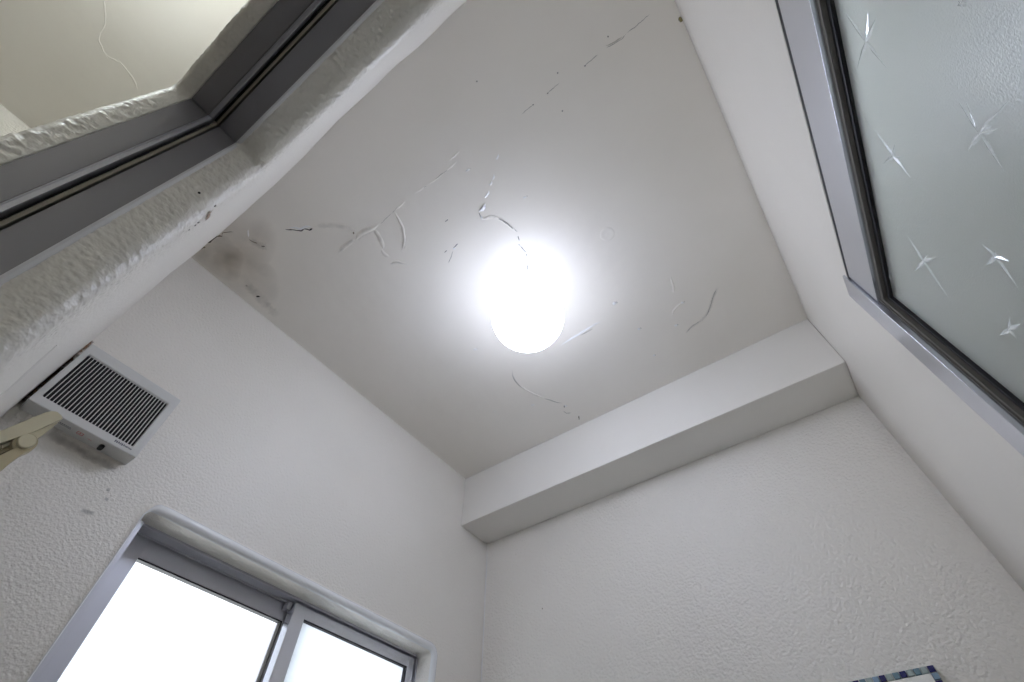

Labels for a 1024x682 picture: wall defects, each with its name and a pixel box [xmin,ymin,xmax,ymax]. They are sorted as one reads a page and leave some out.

crack [479,154,528,270]